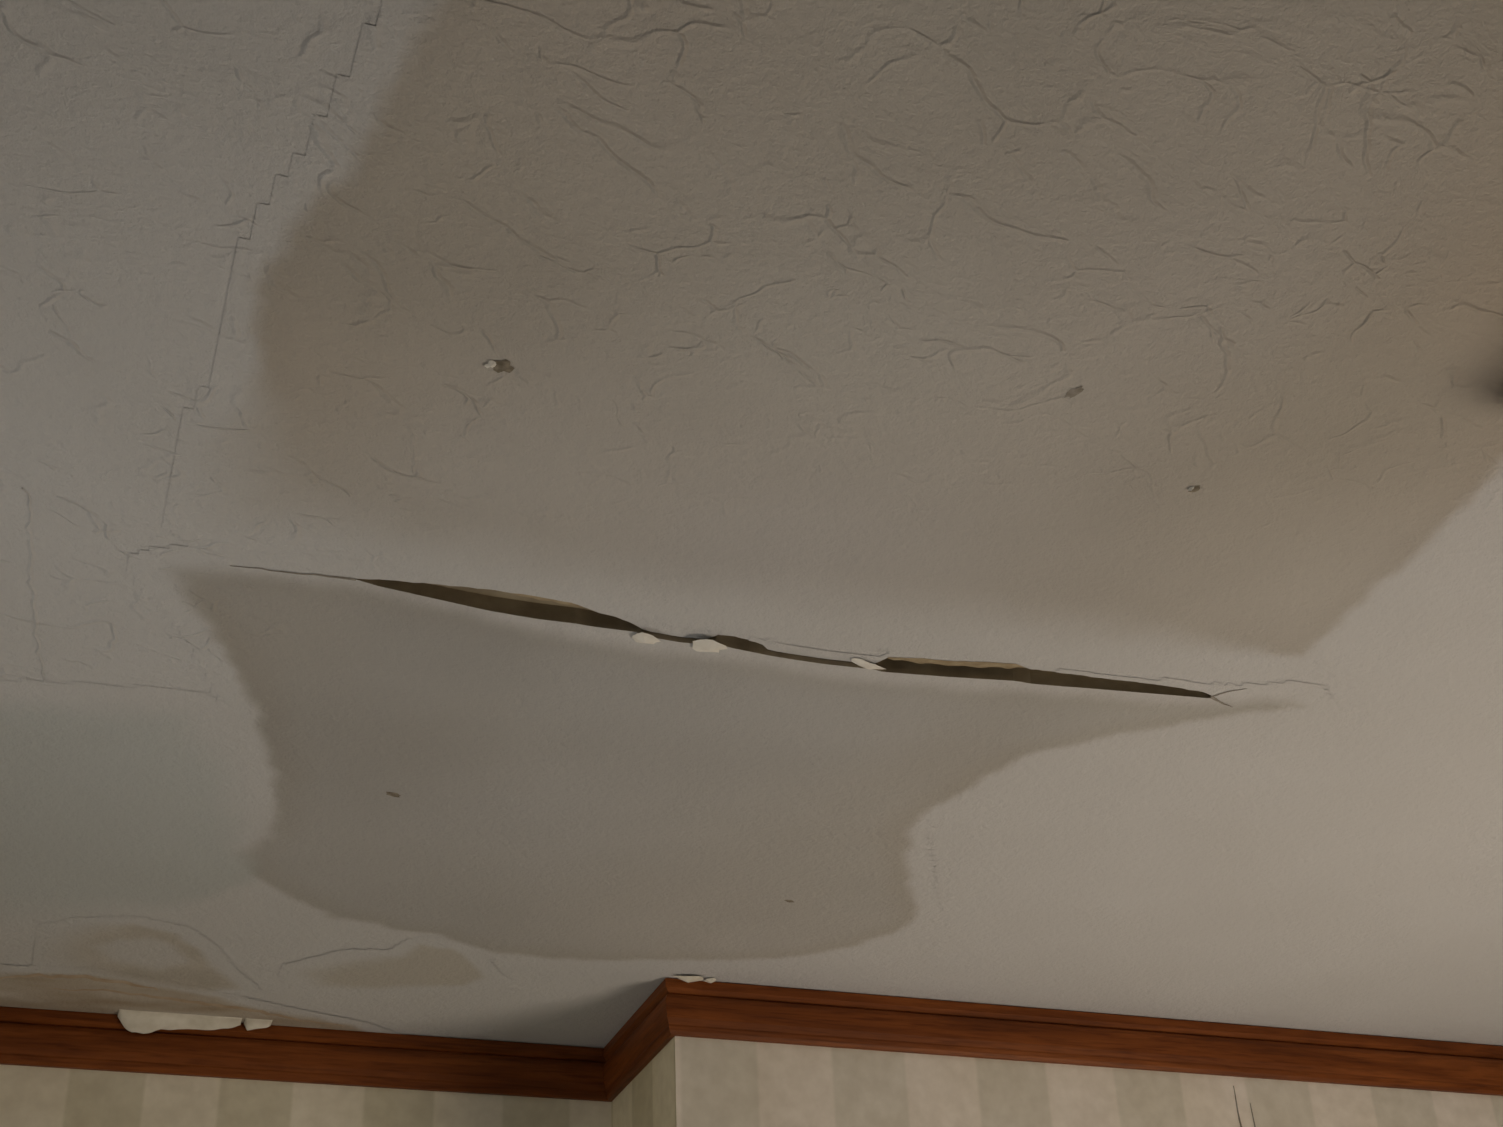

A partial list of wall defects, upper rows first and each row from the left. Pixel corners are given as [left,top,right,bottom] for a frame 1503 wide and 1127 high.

damp [162,0,1503,671]
damp [126,544,1334,998]
crack [230,565,1247,707]
peeling [118,1009,273,1034]